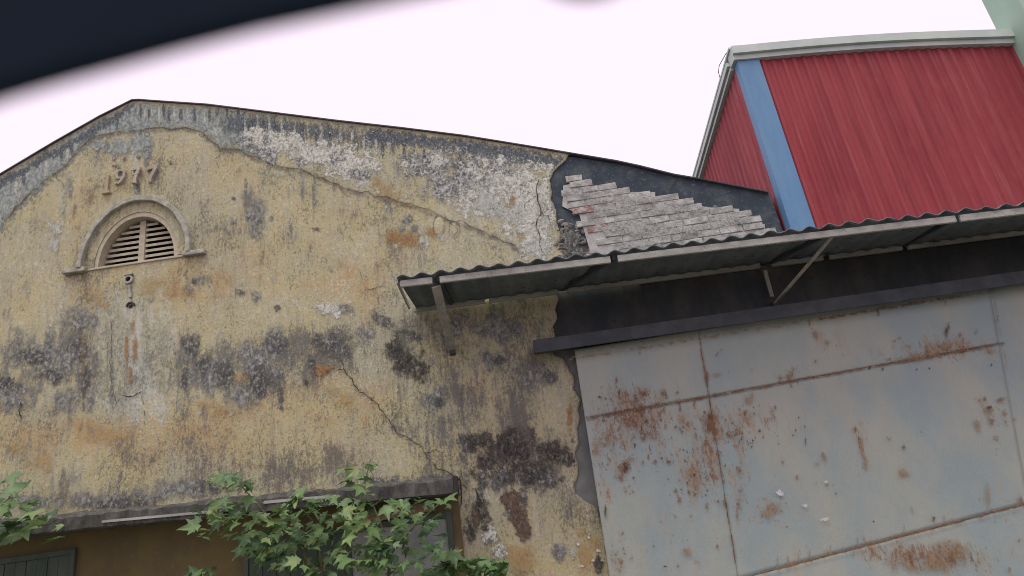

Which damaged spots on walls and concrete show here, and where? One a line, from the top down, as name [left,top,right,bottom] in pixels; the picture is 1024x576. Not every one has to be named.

crack [4,126,551,254]
flaking render [234,127,777,261]
rust [125,321,137,383]
leakage [0,294,293,419]
peeling [314,302,353,319]
leakage [305,312,447,410]
crack [325,360,488,524]
leakage [356,427,575,544]
rust [586,290,1006,564]
rust [758,486,1024,573]